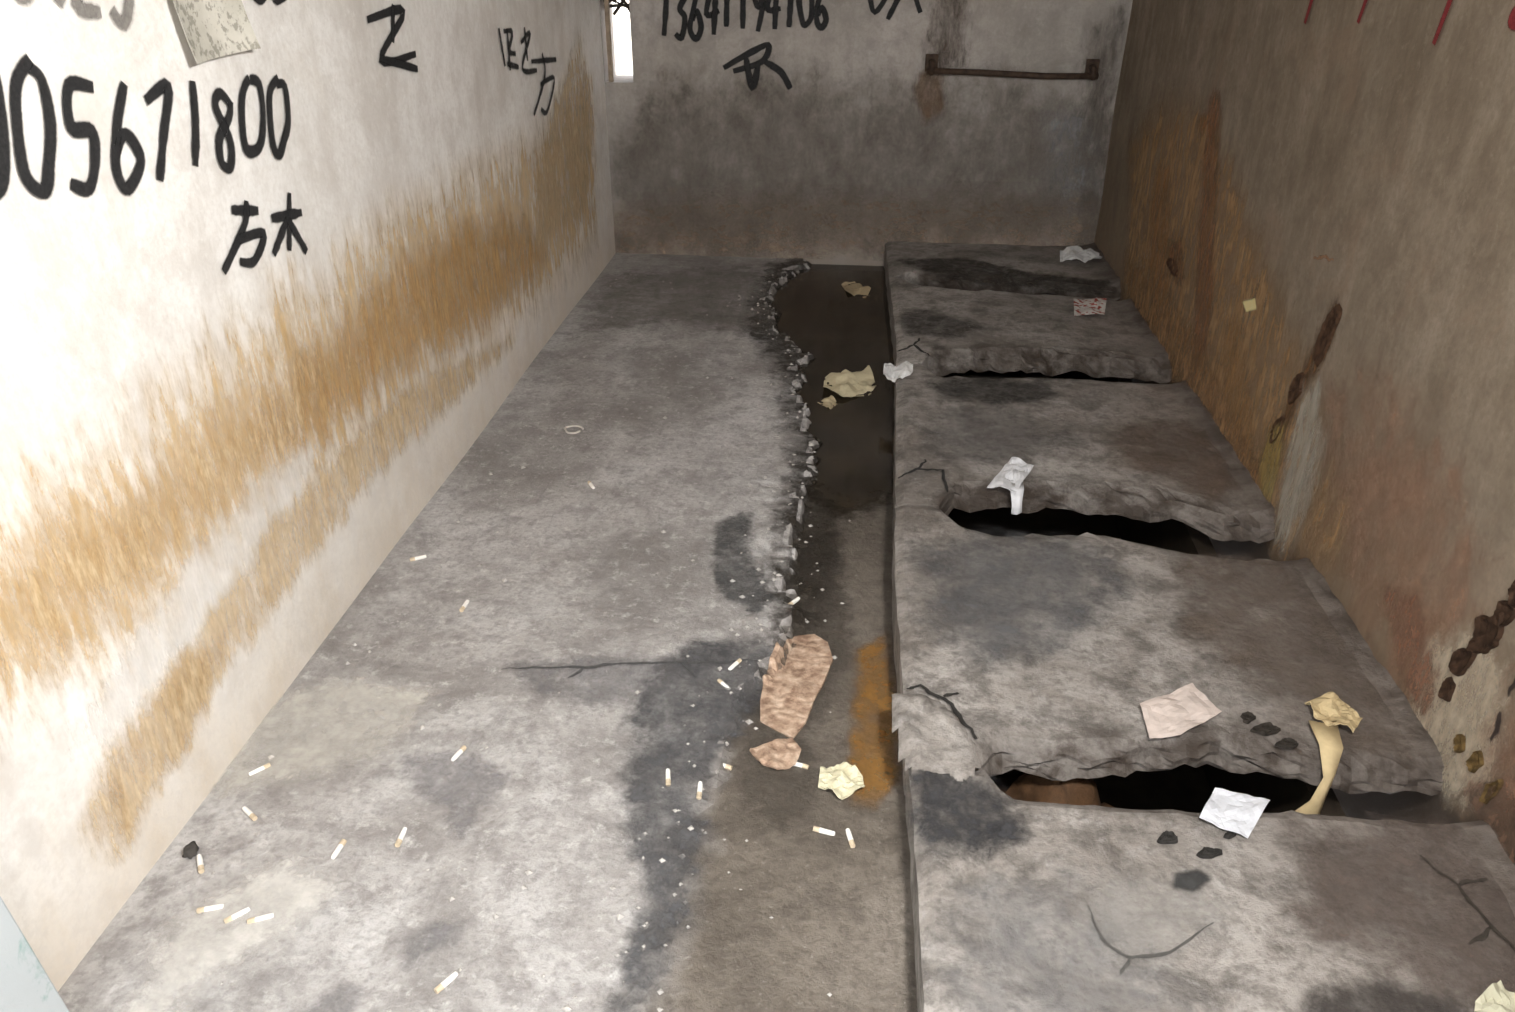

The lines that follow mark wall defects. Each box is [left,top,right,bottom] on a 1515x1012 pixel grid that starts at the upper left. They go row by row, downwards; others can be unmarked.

rust [1243,290,1256,312]
rust [0,61,596,851]
water stain [516,8,1124,1012]
rust [1242,332,1335,497]
rust [849,637,897,800]
flaking render [1438,580,1515,702]
flaking render [1453,734,1504,804]
crack [1087,905,1213,974]